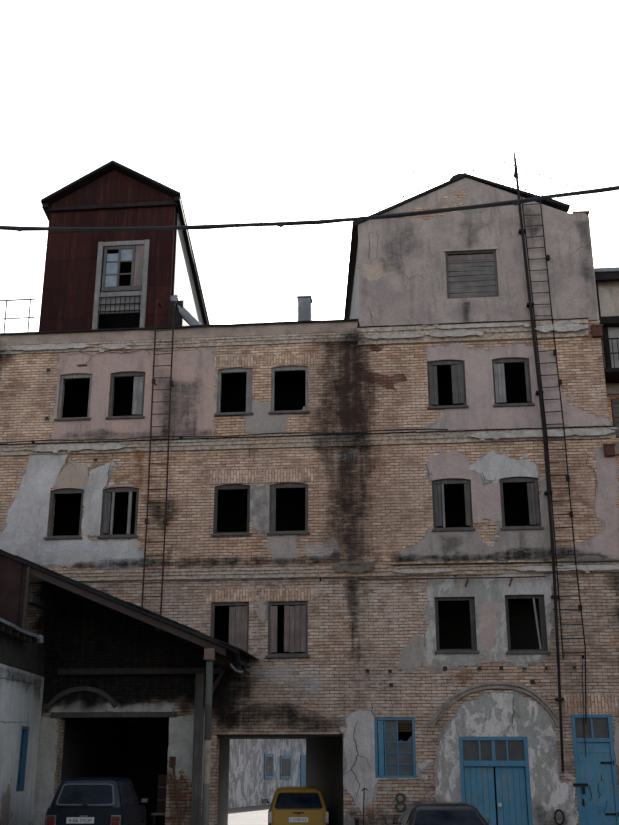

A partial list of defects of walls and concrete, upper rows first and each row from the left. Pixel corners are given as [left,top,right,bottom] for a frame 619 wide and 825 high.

flaking render [392,191,467,220]
flaking render [0,342,218,570]
leakage [36,333,375,568]
flaking render [364,320,619,672]
leakage [426,537,582,561]
flaking render [33,701,213,825]
crack [349,702,393,798]
flaking render [416,690,579,825]